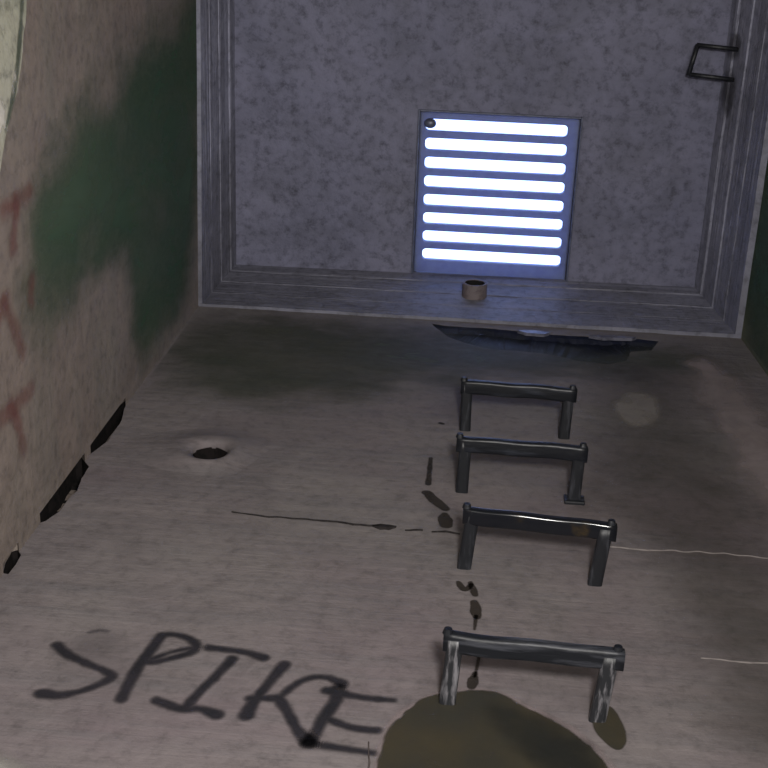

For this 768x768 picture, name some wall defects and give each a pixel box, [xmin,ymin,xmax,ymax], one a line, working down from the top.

spalling [433,324,659,364]
crack [231,511,460,535]
damp [377,657,612,768]
damp [593,706,626,750]